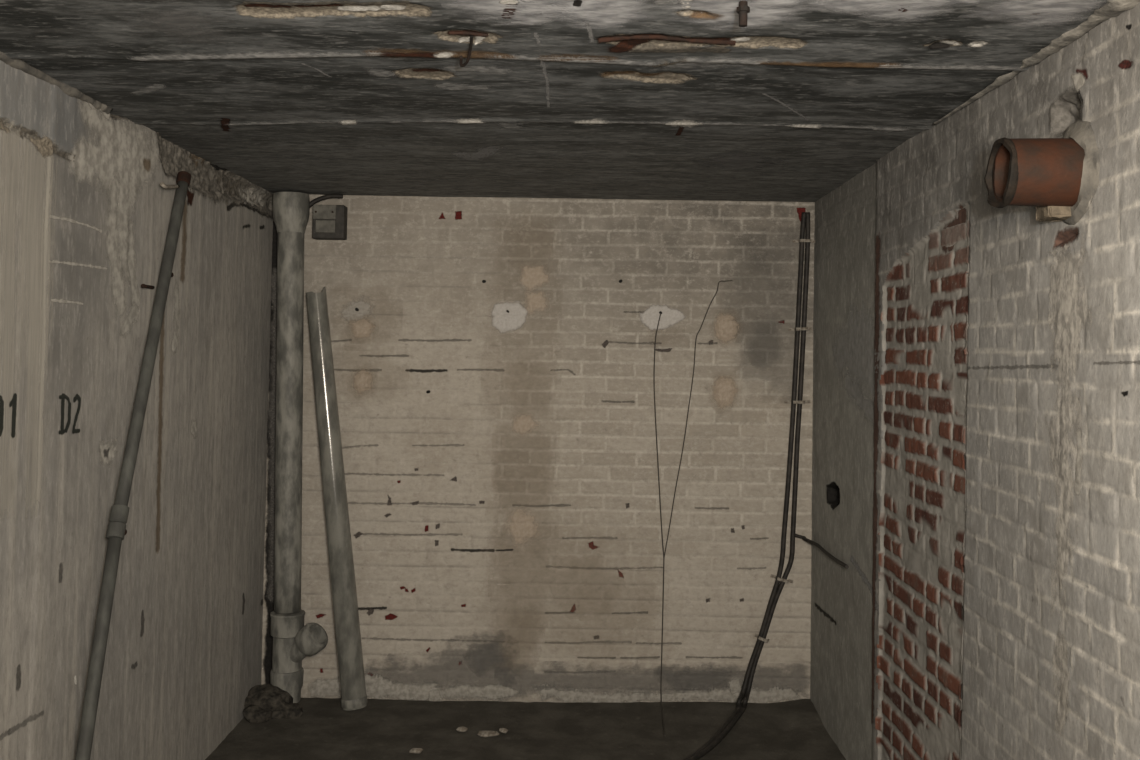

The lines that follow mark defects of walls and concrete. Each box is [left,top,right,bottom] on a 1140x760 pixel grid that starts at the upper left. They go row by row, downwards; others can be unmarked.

spalling [235,1,432,19]
efflorescence [449,0,646,27]
water stain [654,0,1098,27]
corrosion [366,49,515,60]
spalling [597,34,807,53]
spalling [600,71,696,84]
spalling [1048,69,1088,138]
peeling [68,101,273,335]
flaking render [871,202,970,760]
efflorescence [310,678,341,697]
efflorescence [365,674,518,701]
water stain [533,679,800,703]